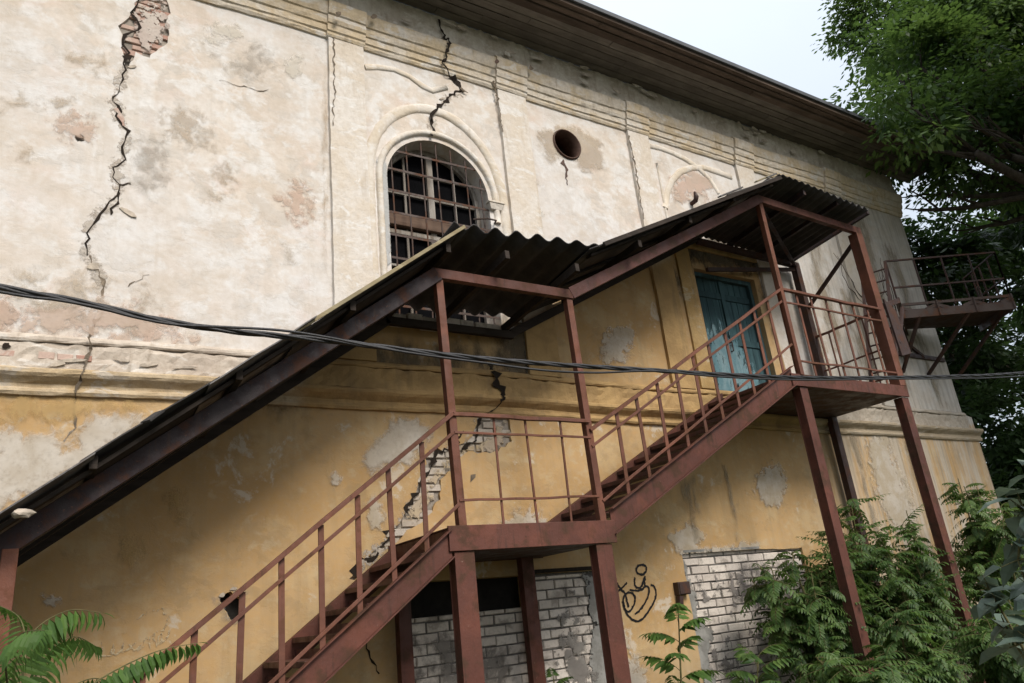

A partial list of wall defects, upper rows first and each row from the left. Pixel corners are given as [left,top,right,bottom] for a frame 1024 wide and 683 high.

spalling [119,0,170,69]
crack [427,19,468,137]
crack [79,0,149,296]
crack [63,325,95,441]
peeling [0,413,143,512]
crack [349,364,506,577]
spalling [364,418,511,561]
peeling [668,522,760,555]
peeling [754,465,788,509]